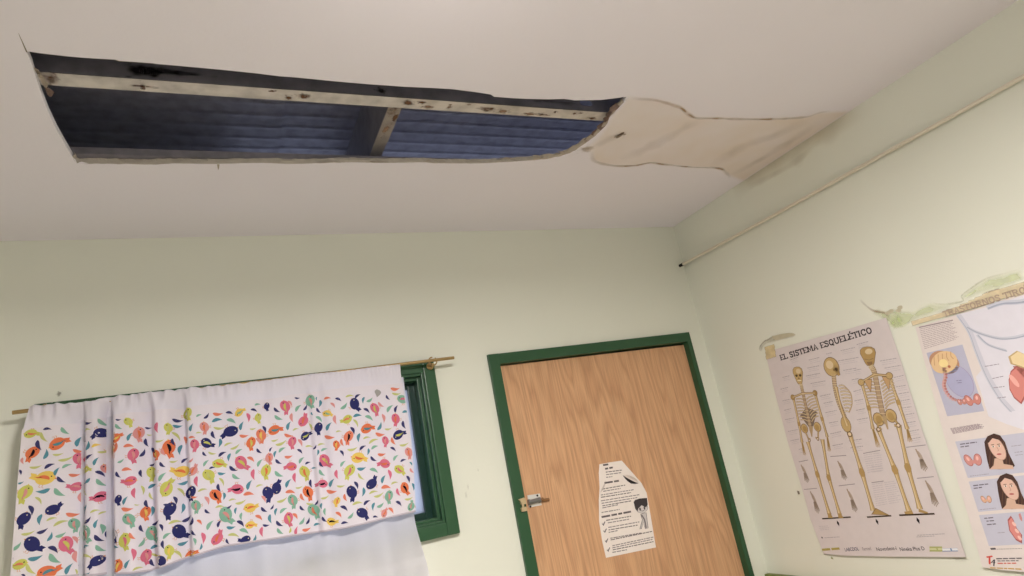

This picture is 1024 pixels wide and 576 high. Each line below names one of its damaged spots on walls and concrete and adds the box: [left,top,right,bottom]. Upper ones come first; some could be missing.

spalling [73,99,623,169]
leakage [583,94,852,182]